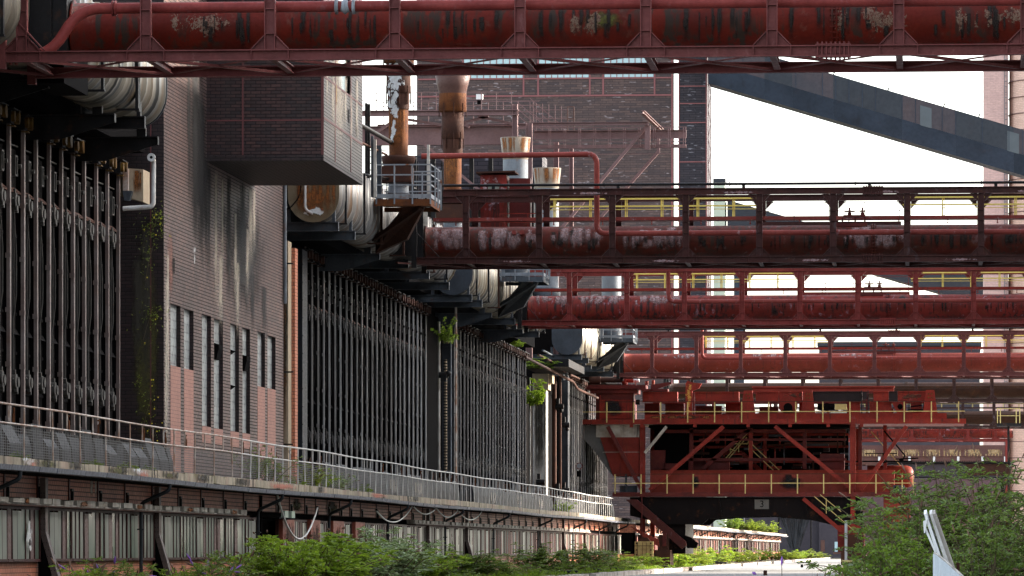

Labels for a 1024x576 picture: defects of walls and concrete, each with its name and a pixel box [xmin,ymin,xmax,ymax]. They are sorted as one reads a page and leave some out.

peeling [171,13,231,37]
peeling [570,10,617,35]
peeling [862,7,911,33]
peeling [956,6,1020,32]
peeling [387,63,405,141]
rust [502,138,530,151]
rust [534,168,559,180]
water stain [187,65,266,325]
peeling [433,229,463,248]
peeling [479,228,536,249]
peeling [552,228,603,245]
peeling [623,227,682,247]